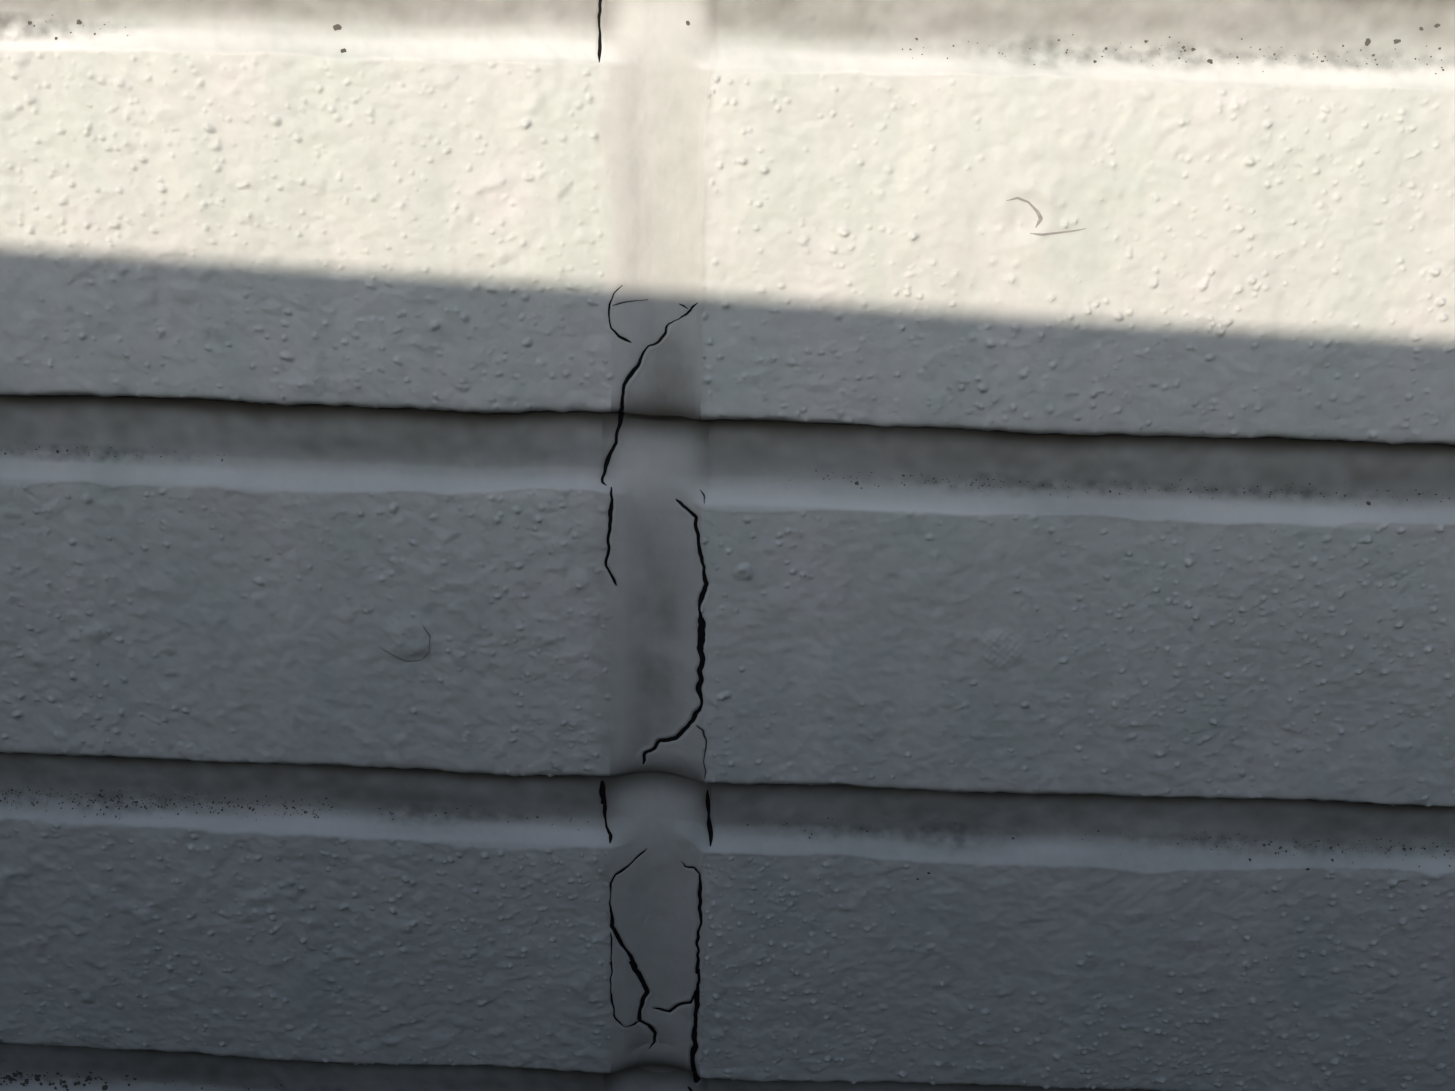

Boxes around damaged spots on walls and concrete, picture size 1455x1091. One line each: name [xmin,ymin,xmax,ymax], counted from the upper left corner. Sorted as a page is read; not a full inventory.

crack [595,0,603,62]
crack [601,285,698,586]
crack [599,490,713,1091]